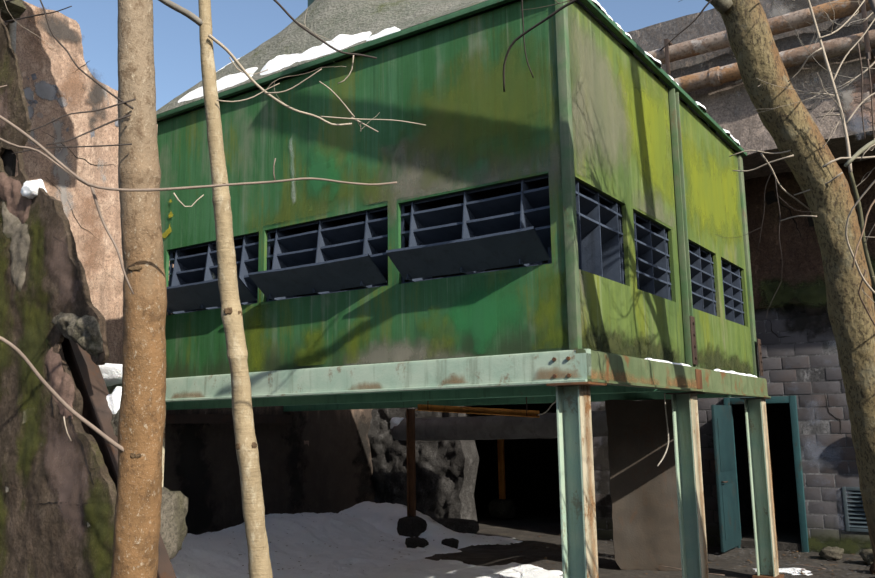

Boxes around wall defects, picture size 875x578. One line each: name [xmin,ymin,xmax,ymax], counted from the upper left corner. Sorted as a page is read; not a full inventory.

spalling [839,76,875,132]
corrosion [538,370,576,380]